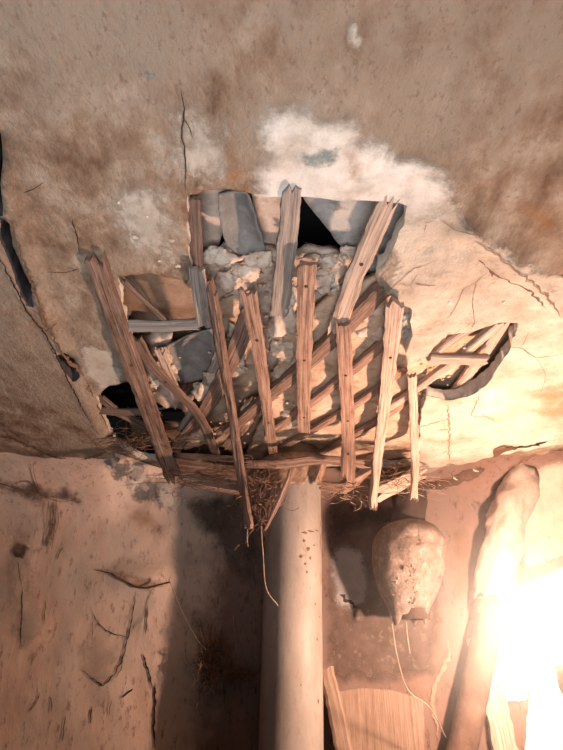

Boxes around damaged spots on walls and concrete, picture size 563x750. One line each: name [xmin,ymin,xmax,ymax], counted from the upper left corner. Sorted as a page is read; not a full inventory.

crack [181,94,193,190]
peeling [108,188,181,268]
crack [0,220,106,430]
peeling [80,346,121,389]
peeling [257,110,563,490]
crack [418,211,561,349]
crack [0,436,105,460]
spalling [104,456,182,512]
crack [81,594,136,686]